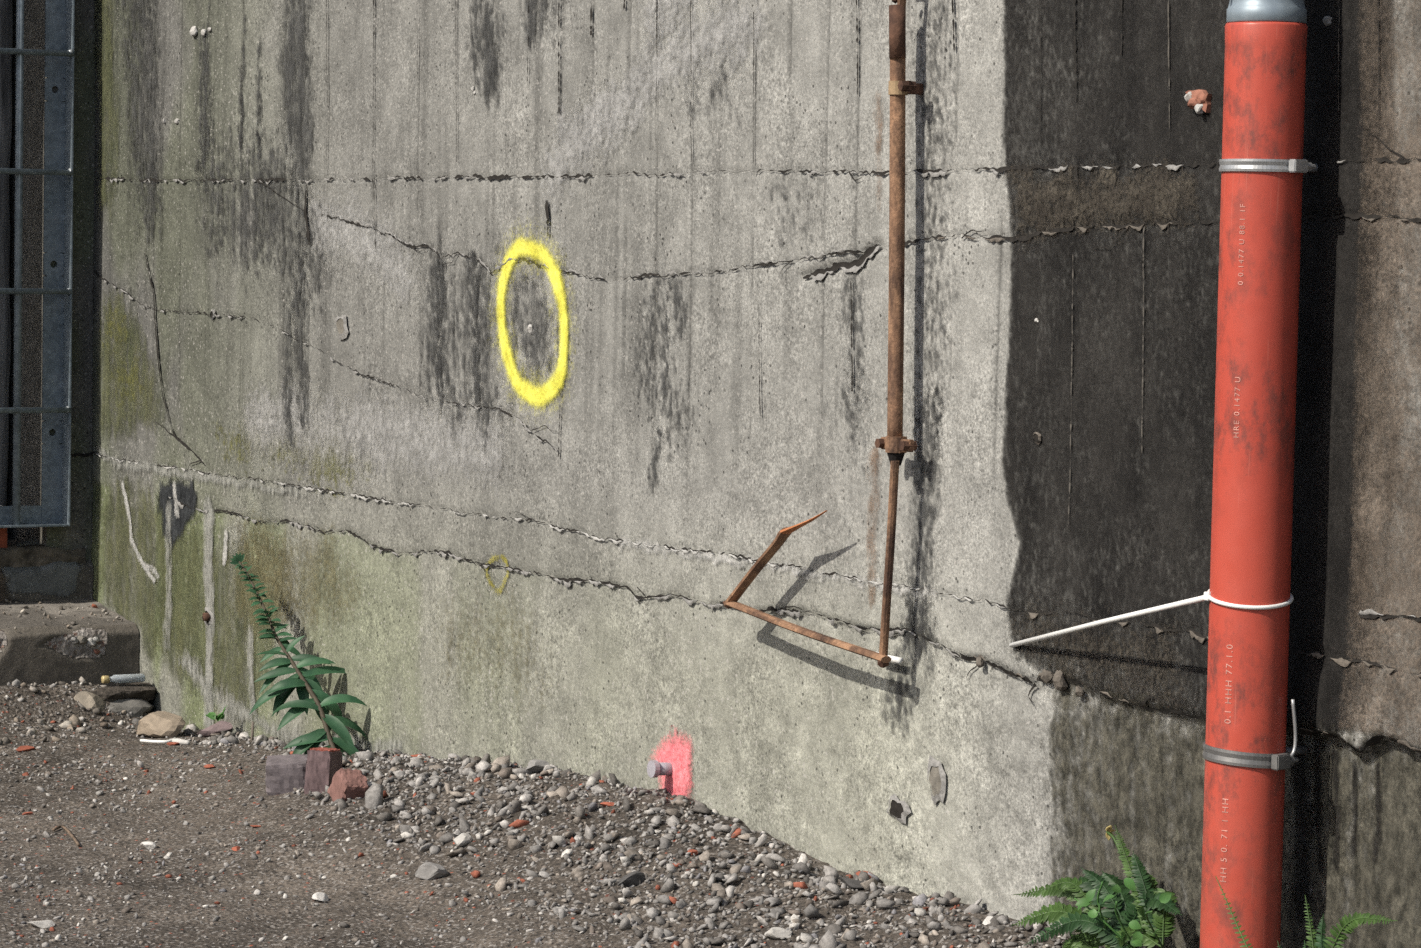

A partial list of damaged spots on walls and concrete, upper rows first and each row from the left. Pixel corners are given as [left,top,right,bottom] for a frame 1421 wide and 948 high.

damp [465,0,506,108]
damp [523,0,555,50]
damp [420,233,559,447]
crack [71,253,1208,643]
damp [1002,0,1230,948]
damp [1280,0,1421,948]
damp [98,449,319,741]
crack [760,606,1205,719]
crack [1289,649,1421,677]
damp [324,735,400,753]
crack [1286,726,1421,753]